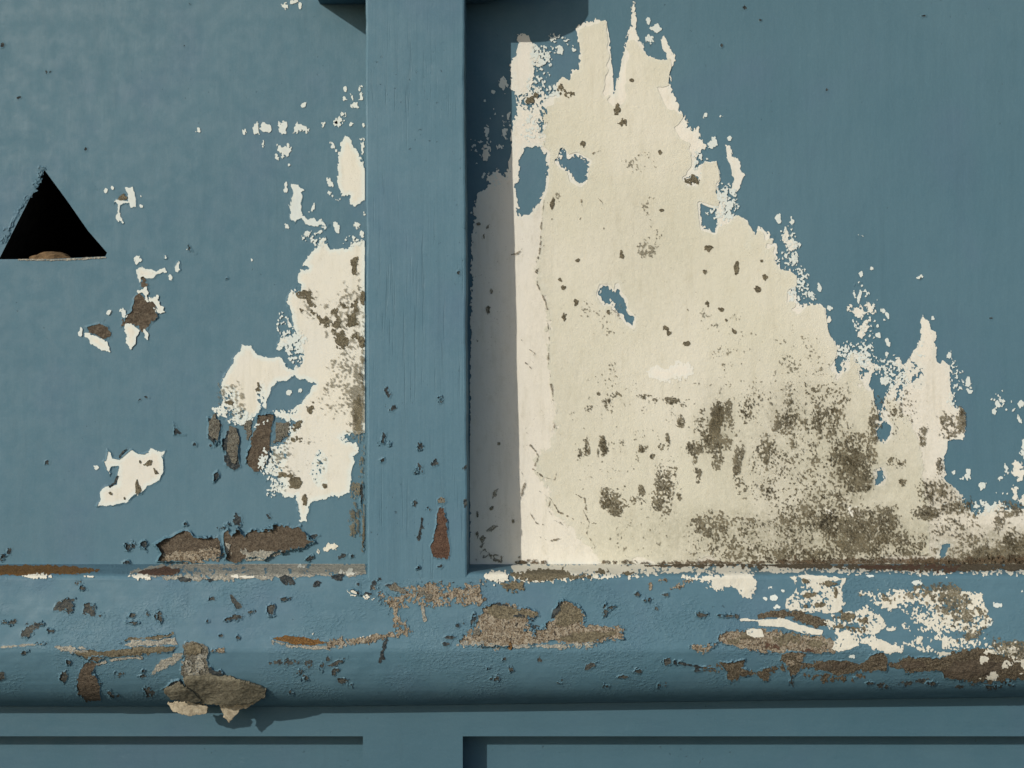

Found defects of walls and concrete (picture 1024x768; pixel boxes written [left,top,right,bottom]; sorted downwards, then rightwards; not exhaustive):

peeling [1,165,47,244]
spalling [104,185,143,225]
leakage [637,197,662,258]
spalling [78,243,198,352]
peeling [121,0,1024,692]
peeling [94,446,167,508]
leakage [571,336,1024,564]
rust [429,495,452,561]
rust [0,564,100,579]
spalling [51,578,106,619]
spalling [0,593,293,722]